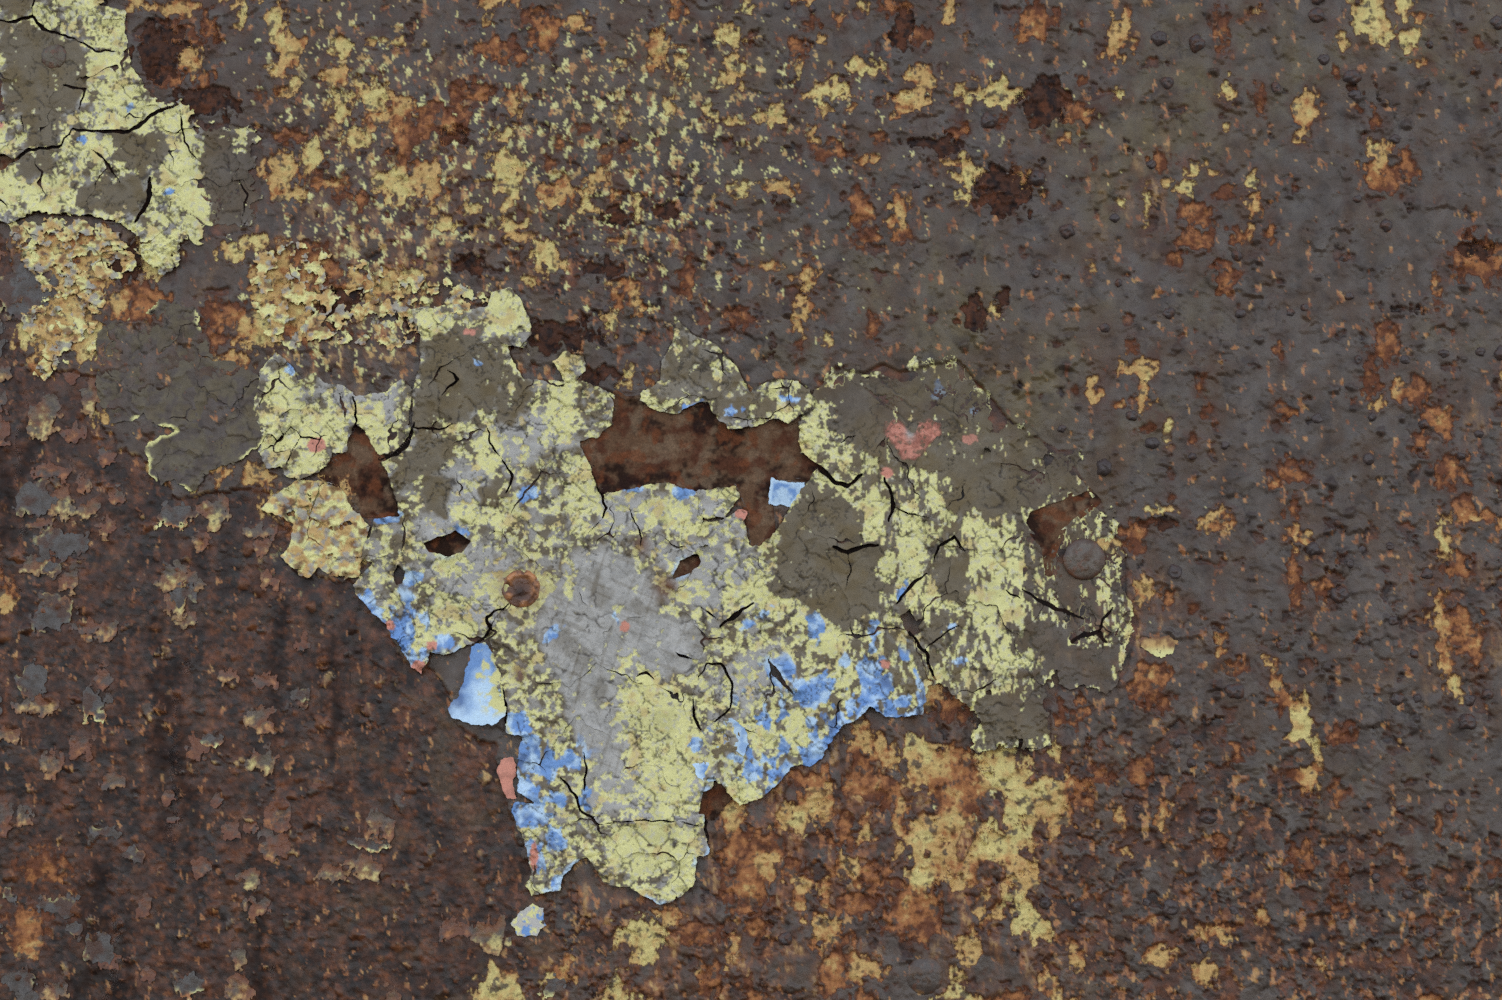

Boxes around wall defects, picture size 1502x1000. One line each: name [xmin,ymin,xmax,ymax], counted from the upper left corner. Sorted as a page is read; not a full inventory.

crack [0,85,197,223]
rust [304,3,597,215]
peeling [1142,160,1223,229]
rust [1317,54,1422,203]
crack [378,370,514,504]
peeling [0,0,1180,1000]
crack [801,435,965,677]
peeling [1196,503,1237,535]
rust [1354,321,1502,730]
crack [636,602,754,730]
peeling [1213,626,1228,662]
rust [665,798,905,1000]